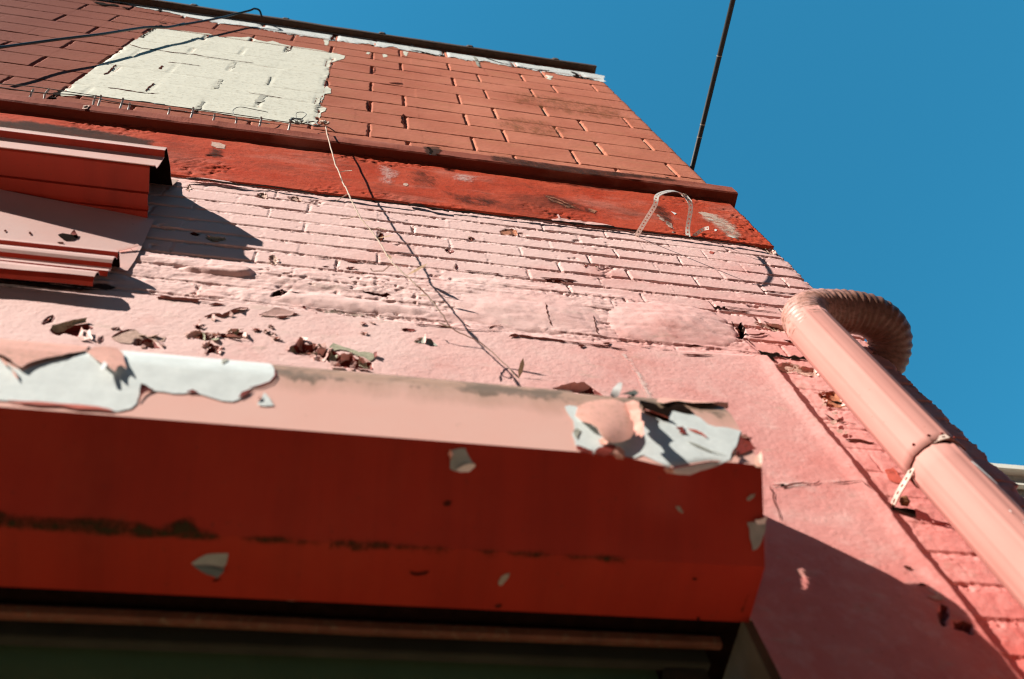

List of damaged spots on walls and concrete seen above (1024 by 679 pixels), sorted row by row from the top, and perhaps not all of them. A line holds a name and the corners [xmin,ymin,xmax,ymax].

peeling [0,289,377,411]
peeling [565,382,762,475]
spalling [818,391,874,443]
peeling [448,448,476,472]
peeling [885,468,903,483]
leakage [0,512,218,539]
peeling [747,516,768,550]
peeling [191,553,228,582]